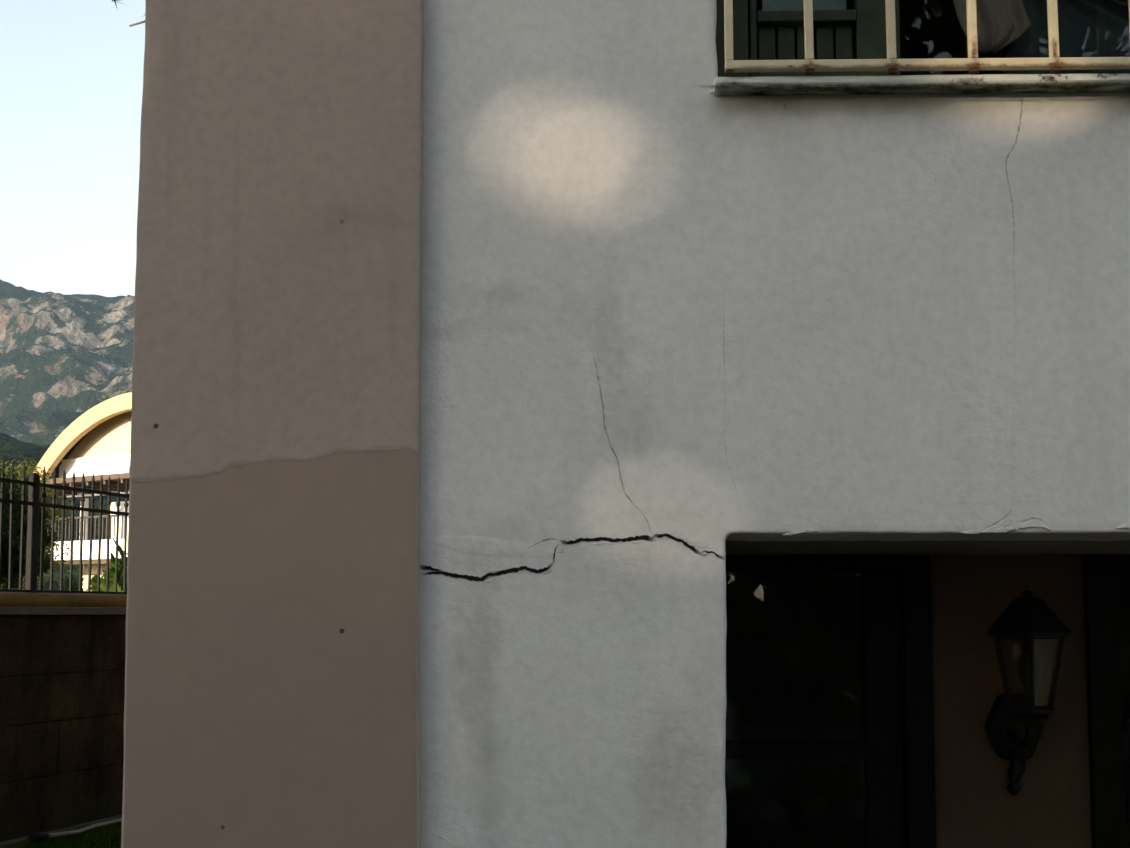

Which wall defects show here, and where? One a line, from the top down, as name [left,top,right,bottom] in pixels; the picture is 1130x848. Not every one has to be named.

spalling [961,517,1051,534]
crack [421,534,722,583]